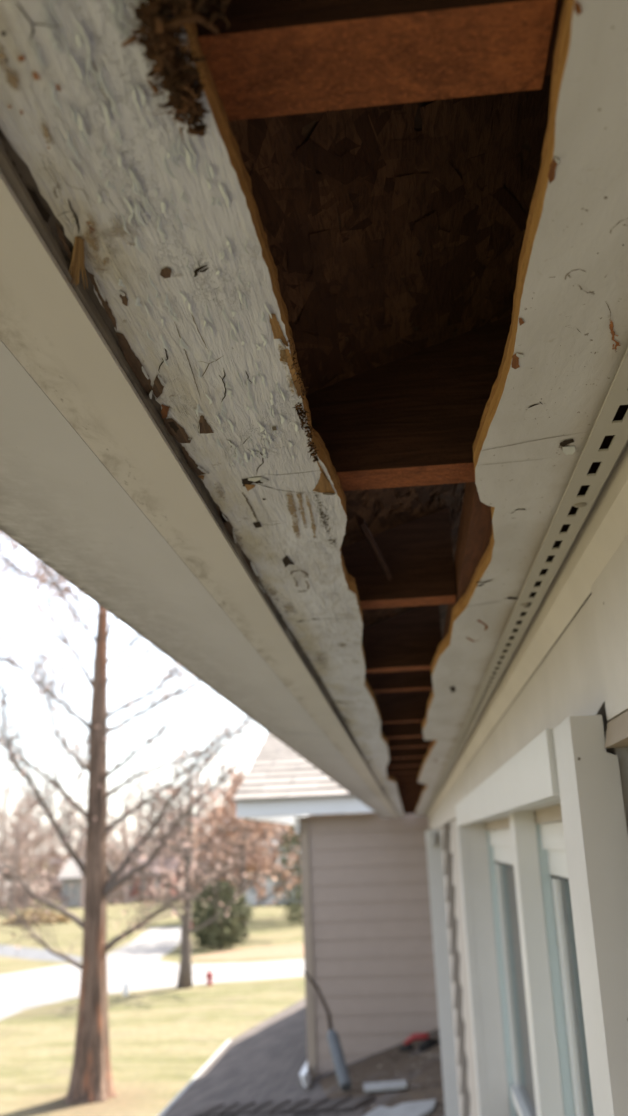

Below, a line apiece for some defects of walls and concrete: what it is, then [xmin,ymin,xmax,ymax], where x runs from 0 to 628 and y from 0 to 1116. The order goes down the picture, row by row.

crack [15,1,58,39]
peeling [547,157,560,183]
peeling [88,272,214,480]
peeling [269,313,301,399]
peeling [511,353,524,369]
peeling [559,439,575,455]
peeling [241,477,269,491]
peeling [313,461,335,495]